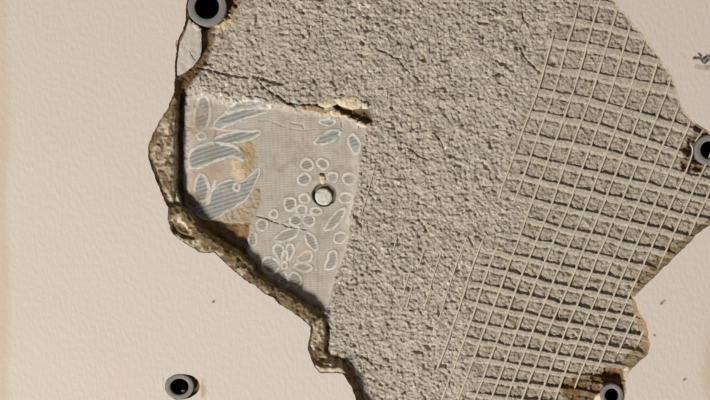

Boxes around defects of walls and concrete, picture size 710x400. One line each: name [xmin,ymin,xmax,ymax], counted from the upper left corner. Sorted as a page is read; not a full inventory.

crack [201,68,320,107]
flaking render [148,0,710,400]